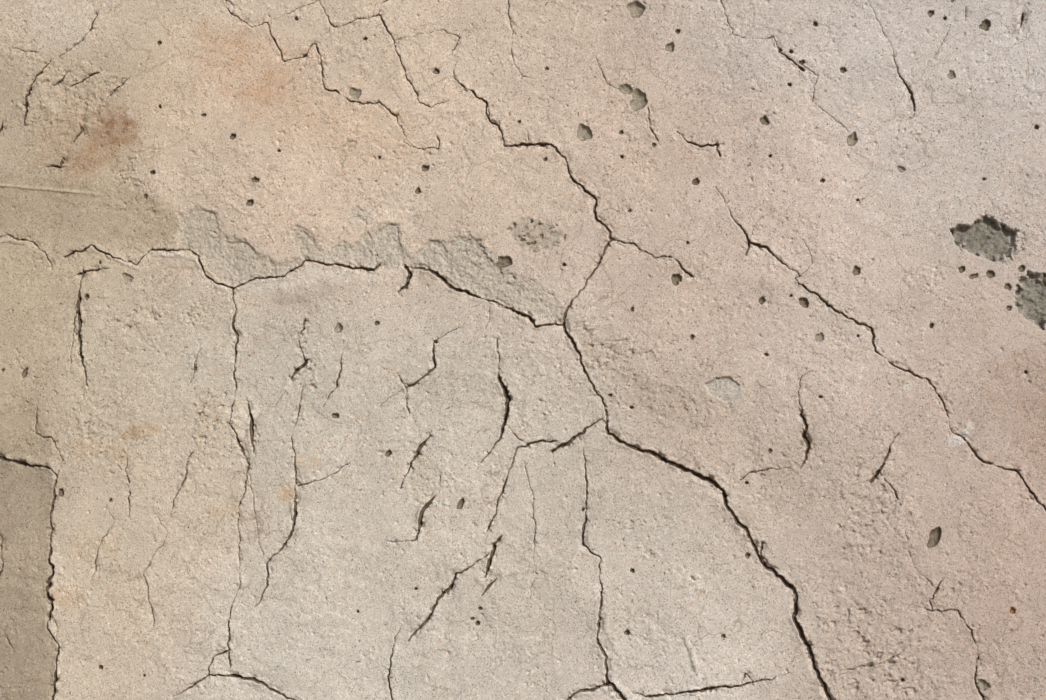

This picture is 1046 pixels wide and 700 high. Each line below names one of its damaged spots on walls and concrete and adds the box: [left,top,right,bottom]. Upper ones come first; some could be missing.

crack [867,0,915,111]
crack [0,0,831,700]
crack [716,188,1046,511]
spalling [949,211,1046,331]
crack [905,532,985,700]